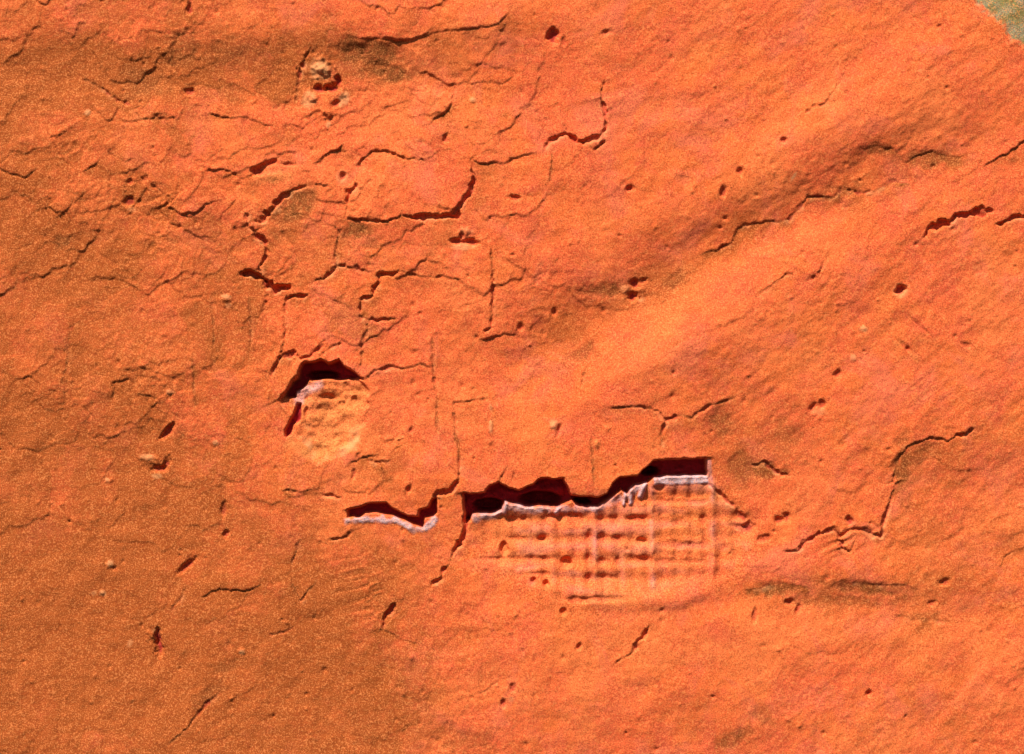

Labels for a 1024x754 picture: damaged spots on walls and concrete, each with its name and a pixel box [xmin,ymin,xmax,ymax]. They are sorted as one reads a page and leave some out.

crack [541,79,613,187]
crack [693,177,916,262]
crack [919,205,1024,244]
crack [236,147,499,508]
spalling [266,340,415,484]
spalling [343,501,439,535]
spalling [454,456,793,618]
crack [740,424,980,628]